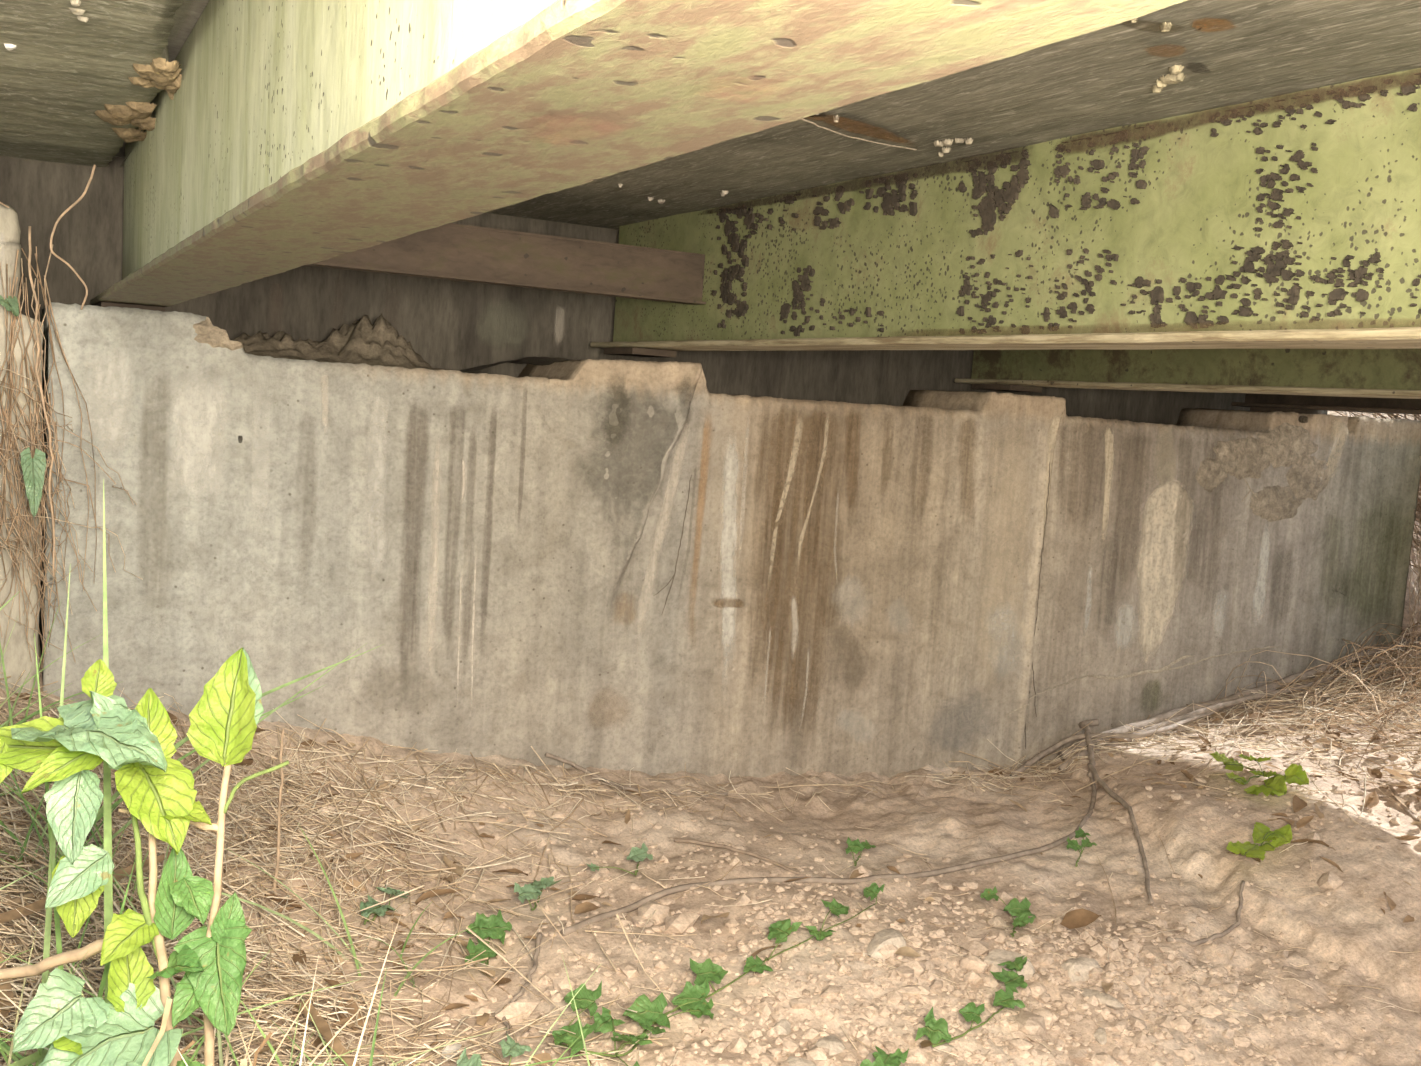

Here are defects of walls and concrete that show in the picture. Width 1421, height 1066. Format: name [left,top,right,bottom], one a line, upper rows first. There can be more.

spalling [1151,65,1186,93]
crack [801,118,917,151]
spalling [933,137,974,157]
peeling [956,82,1421,335]
damp [1102,429,1113,531]
spalling [1195,422,1331,522]
damp [457,563,476,685]
damp [722,450,737,642]
damp [759,414,832,711]
damp [1139,482,1192,653]
damp [1254,532,1268,614]